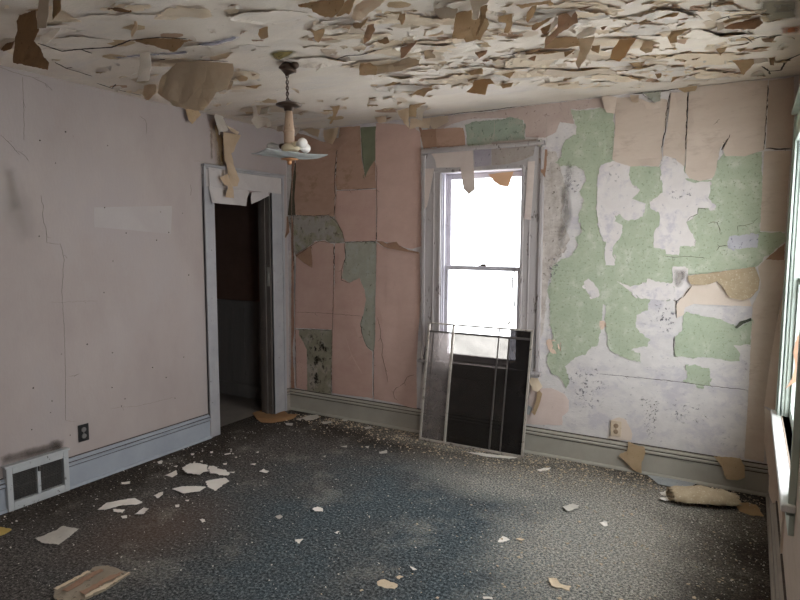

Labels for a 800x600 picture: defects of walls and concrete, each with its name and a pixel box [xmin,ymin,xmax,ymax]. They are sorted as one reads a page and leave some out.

peeling [0,38,15,55]
peeling [37,0,212,74]
peeling [110,33,271,124]
crack [633,88,688,149]
peeling [224,0,795,394]